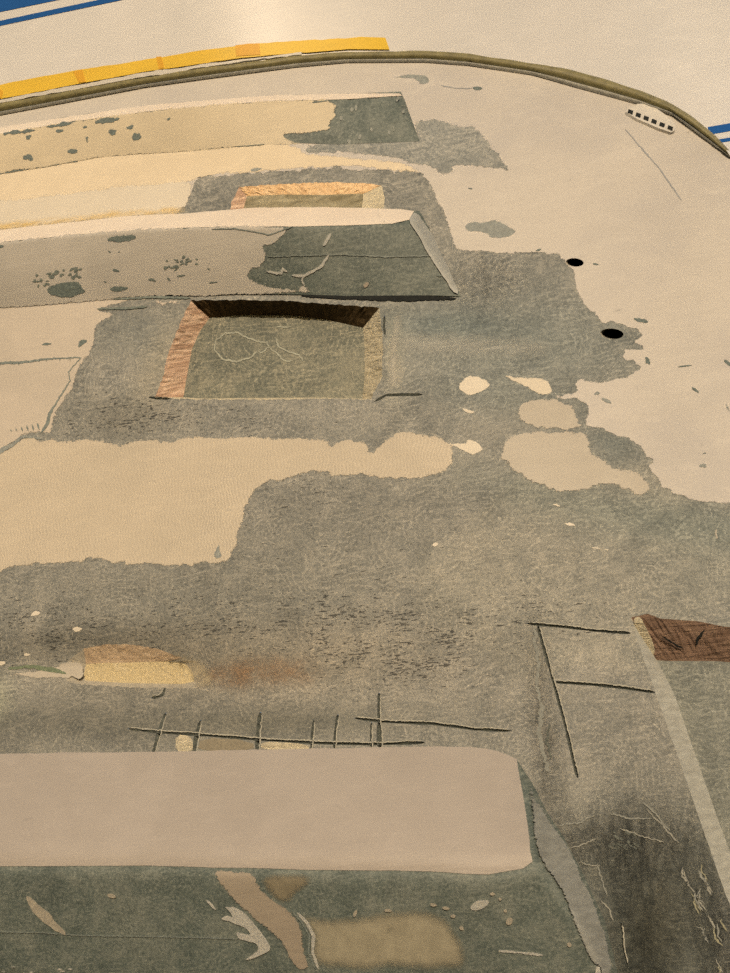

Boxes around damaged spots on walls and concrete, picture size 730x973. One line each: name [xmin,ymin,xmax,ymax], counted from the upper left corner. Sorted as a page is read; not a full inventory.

peeling [3,129,35,139]
peeling [83,117,141,142]
peeling [108,235,136,253]
peeling [148,255,210,282]
peeling [32,267,85,297]